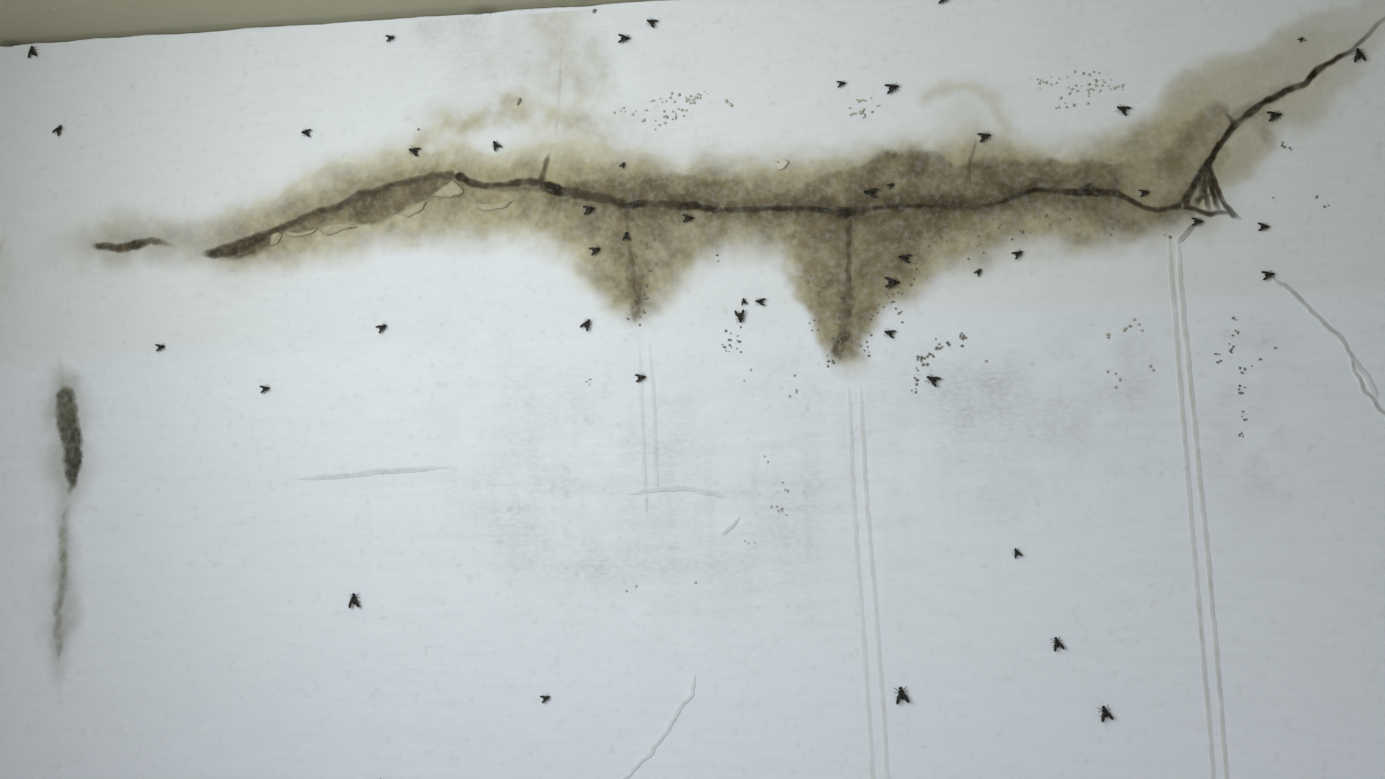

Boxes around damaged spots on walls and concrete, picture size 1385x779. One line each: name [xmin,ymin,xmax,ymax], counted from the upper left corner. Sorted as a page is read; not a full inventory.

spalling [199,170,512,262]
damp [21,129,1216,779]
damp [395,0,1385,207]
crack [454,16,1385,320]
damp [1117,22,1385,779]
crack [1268,276,1385,419]